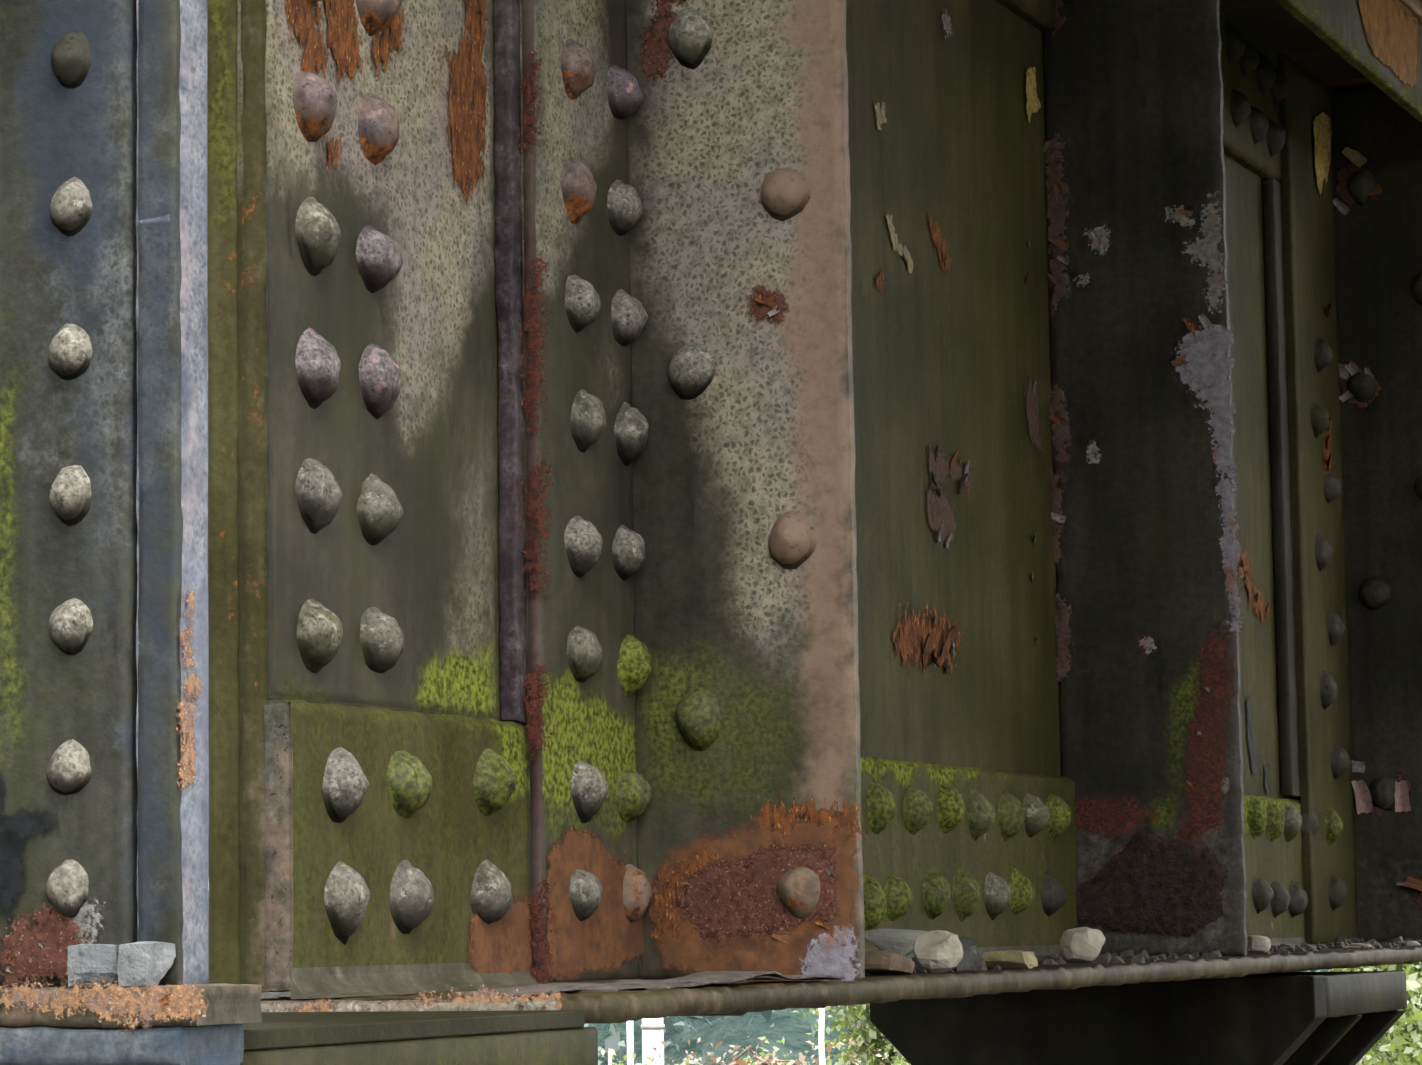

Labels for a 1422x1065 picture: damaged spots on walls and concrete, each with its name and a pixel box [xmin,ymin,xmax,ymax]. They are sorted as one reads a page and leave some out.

rust [286,0,407,82]
rust [442,0,489,204]
rust [638,0,686,82]
rust [747,282,789,324]
peeling [1158,190,1272,637]
peeling [925,441,974,548]
rust [176,587,203,791]
water stain [0,780,56,923]
rust [404,793,867,1010]
rust [1076,826,1227,939]
rust [0,902,207,1033]
rust [295,996,332,1012]